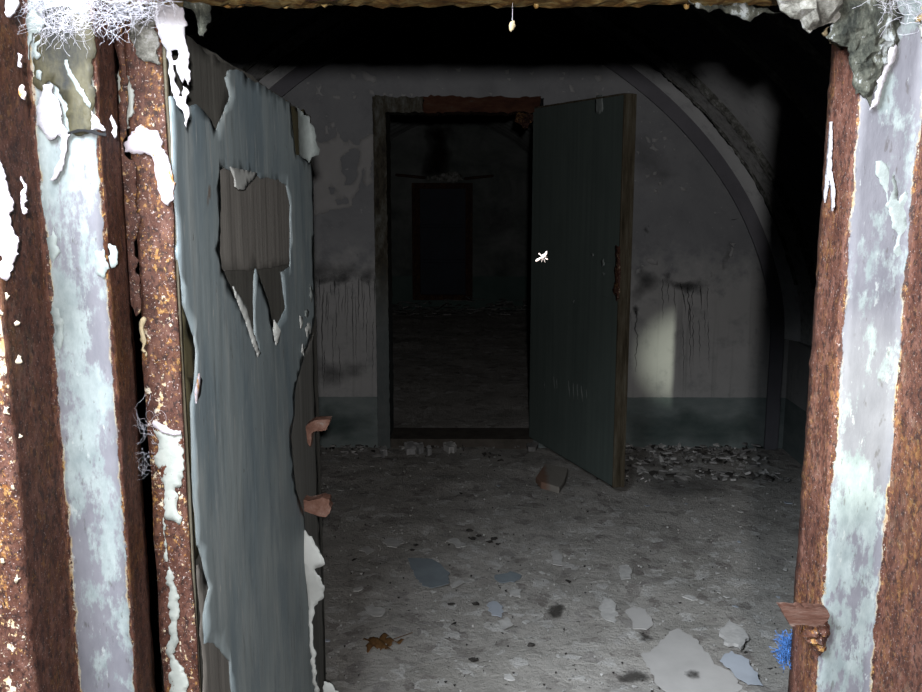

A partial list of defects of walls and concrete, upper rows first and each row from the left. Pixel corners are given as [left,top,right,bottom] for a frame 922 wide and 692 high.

peeling [5,0,176,206]
peeling [869,44,897,110]
peeling [0,162,28,281]
peeling [46,225,61,263]
peeling [94,244,118,279]
peeling [50,307,64,358]
spalling [194,373,203,403]
spalling [152,420,189,692]